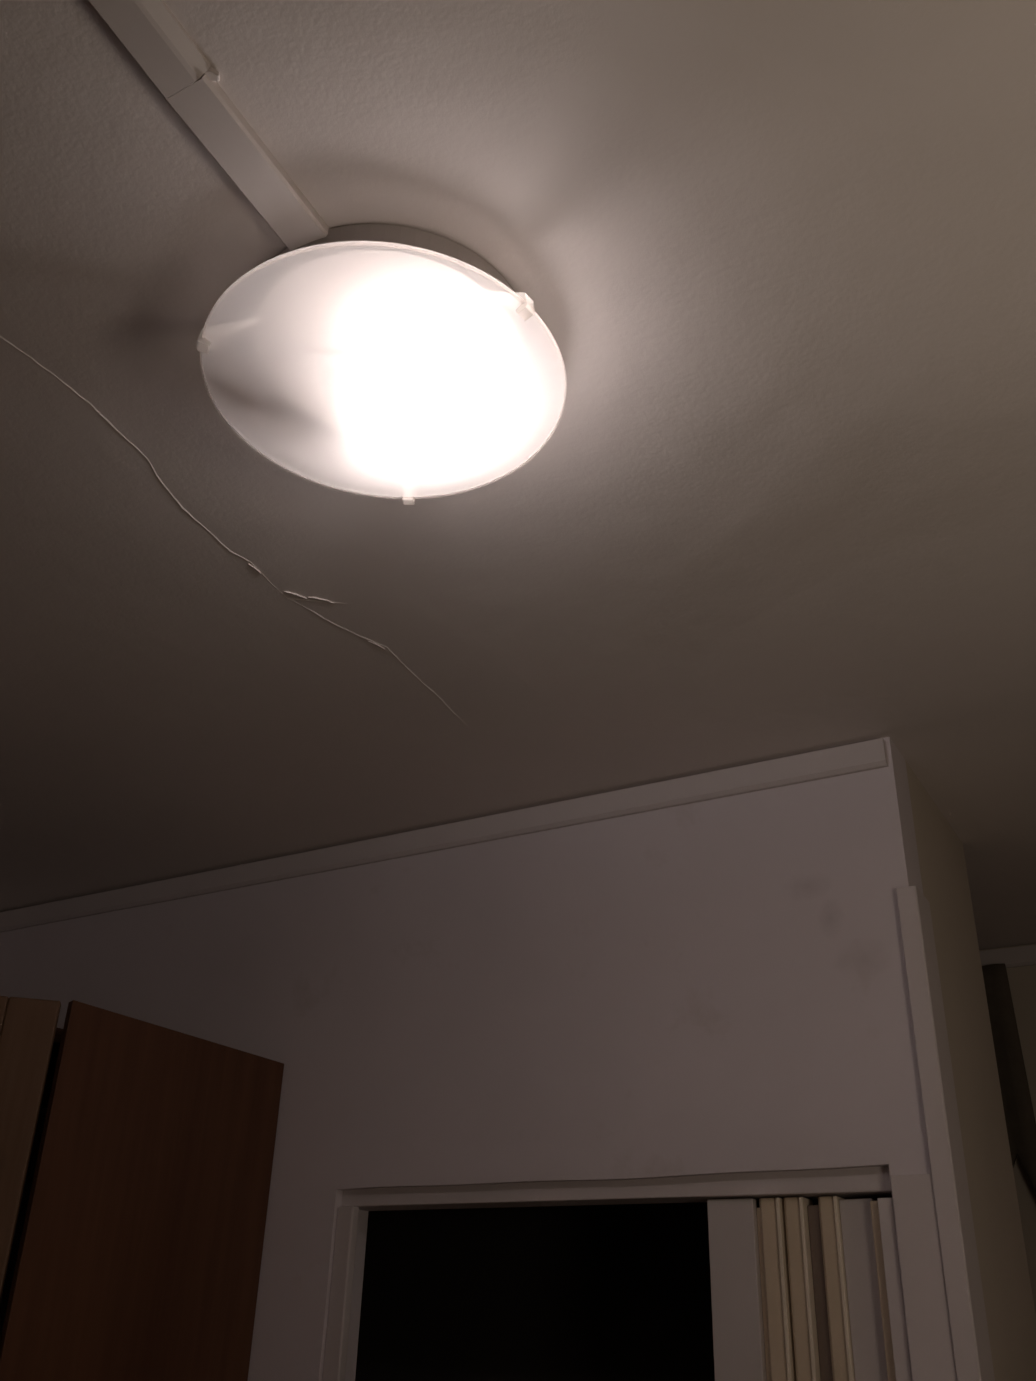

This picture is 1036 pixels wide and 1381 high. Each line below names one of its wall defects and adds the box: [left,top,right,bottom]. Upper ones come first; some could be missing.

crack [0,336,463,722]